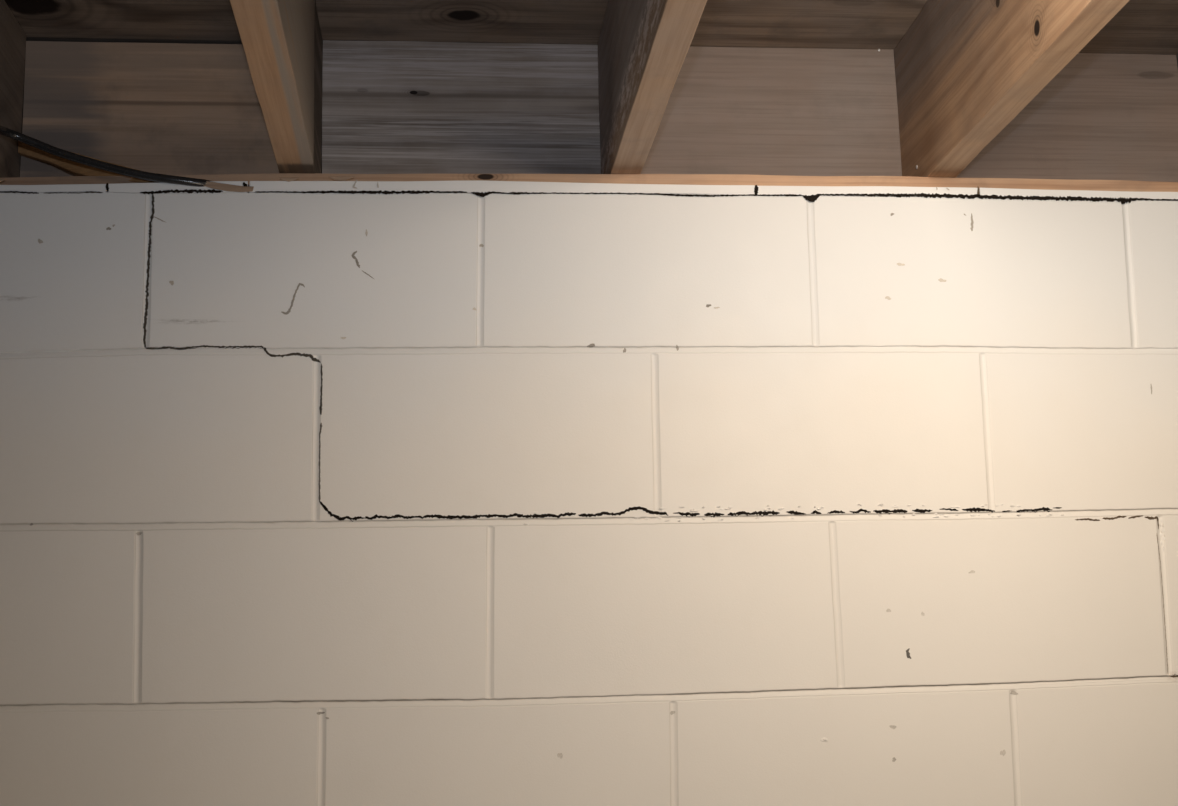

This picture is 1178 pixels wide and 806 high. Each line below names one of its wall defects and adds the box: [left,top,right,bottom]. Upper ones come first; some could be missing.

crack [0,188,103,196]
crack [140,189,1178,677]